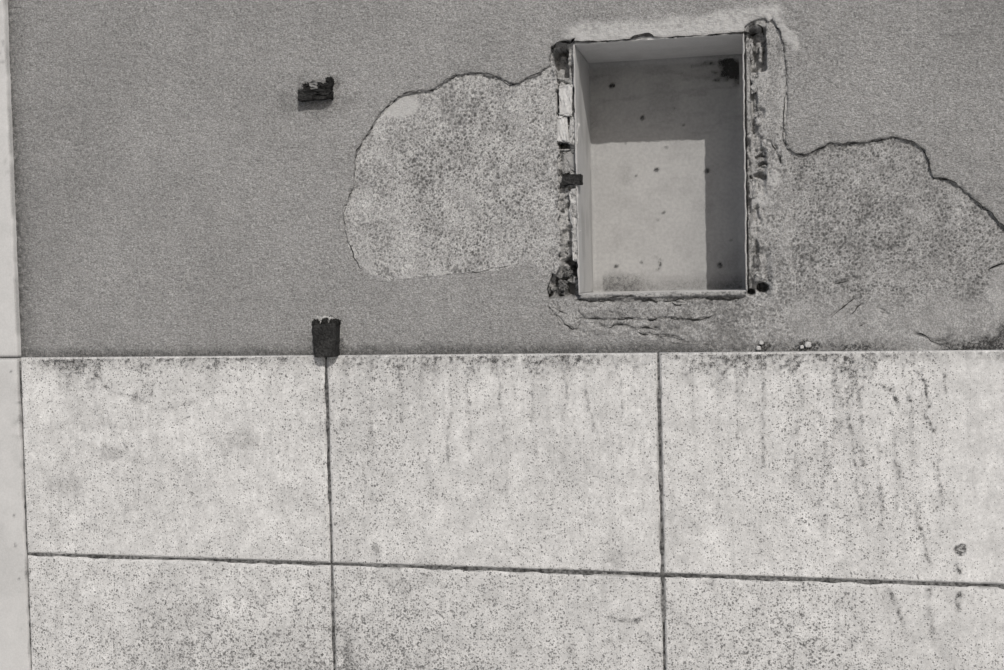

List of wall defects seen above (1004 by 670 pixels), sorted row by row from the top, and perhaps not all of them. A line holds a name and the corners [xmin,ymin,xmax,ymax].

peeling [343,61,562,282]
peeling [770,19,1004,351]